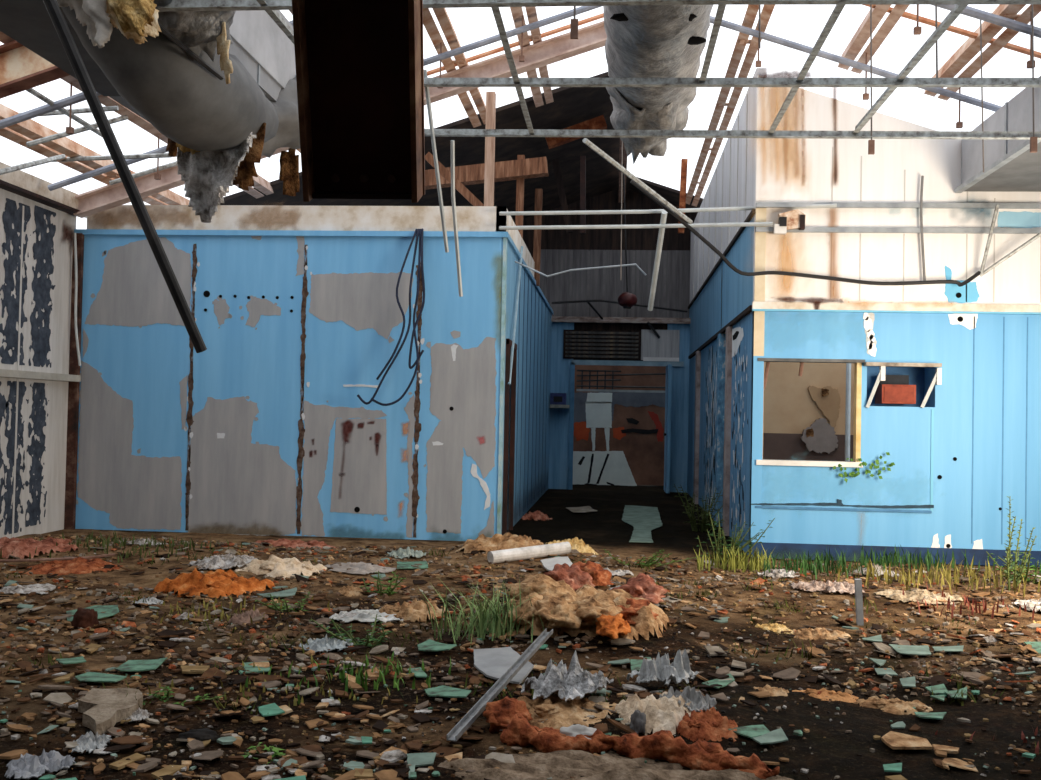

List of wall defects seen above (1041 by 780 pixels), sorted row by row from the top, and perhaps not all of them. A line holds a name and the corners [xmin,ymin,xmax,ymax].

peeling [0,198,56,368]
peeling [997,211,1041,228]
peeling [0,381,49,535]
peeling [76,236,497,538]